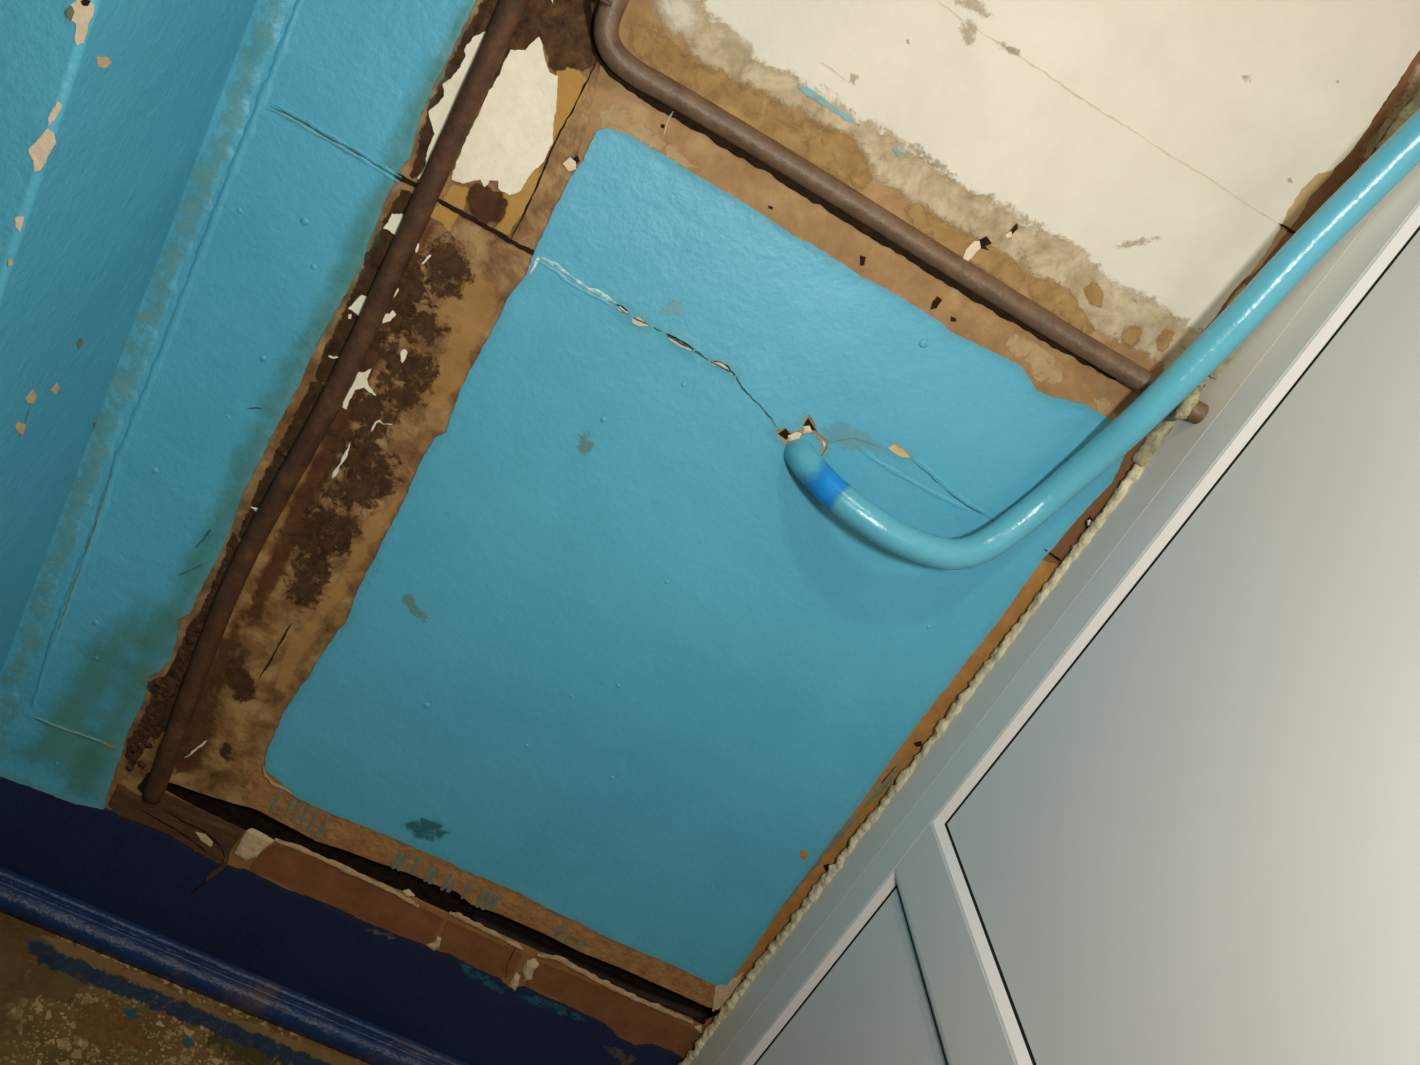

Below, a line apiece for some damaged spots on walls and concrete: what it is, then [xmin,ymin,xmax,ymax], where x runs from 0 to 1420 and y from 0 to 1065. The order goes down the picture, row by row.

peeling [29,101,62,171]
corrosion [466,183,508,224]
corrosion [481,0,600,107]
crack [267,0,1117,431]
leakage [631,0,1203,370]
crack [938,1,1296,234]
leakage [1226,170,1334,307]
peeling [105,0,486,814]
corrosion [125,0,500,772]
leakage [1006,334,1063,384]
peeling [169,37,1165,1065]
crack [142,809,225,857]